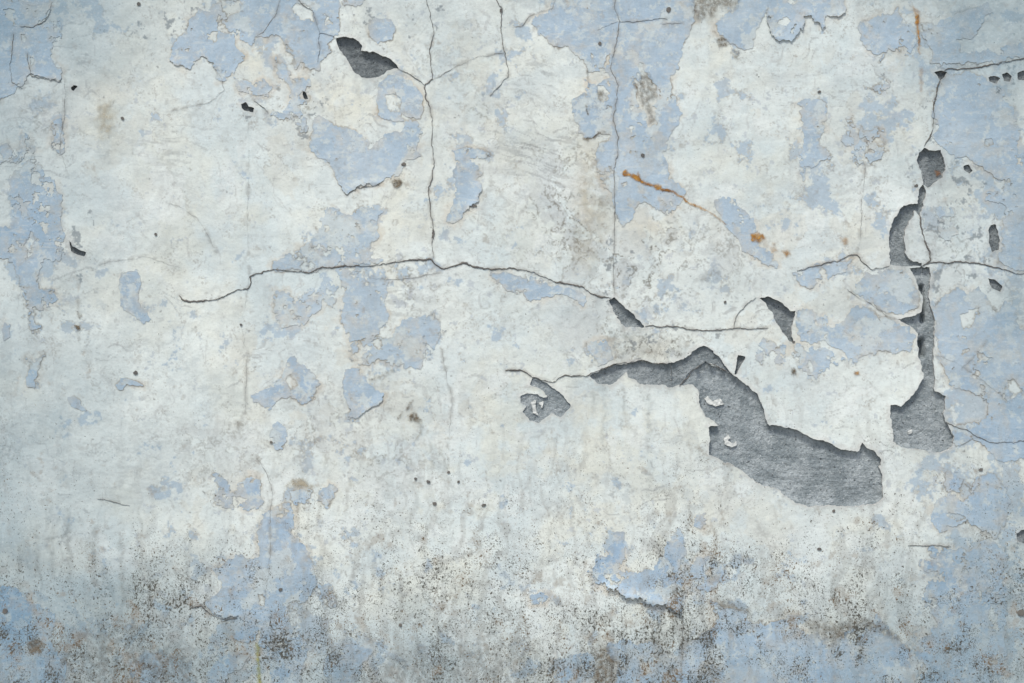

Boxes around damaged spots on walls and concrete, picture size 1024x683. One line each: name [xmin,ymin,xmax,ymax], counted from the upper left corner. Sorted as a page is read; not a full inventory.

peeling [169,0,424,195]
crack [924,58,1024,146]
crack [179,0,678,413]
corrosion [623,170,702,209]
flaking render [584,0,1024,507]
crack [797,176,884,271]
crack [919,214,1023,274]
crack [648,302,762,331]
flaking render [520,377,570,423]
crack [505,360,730,386]